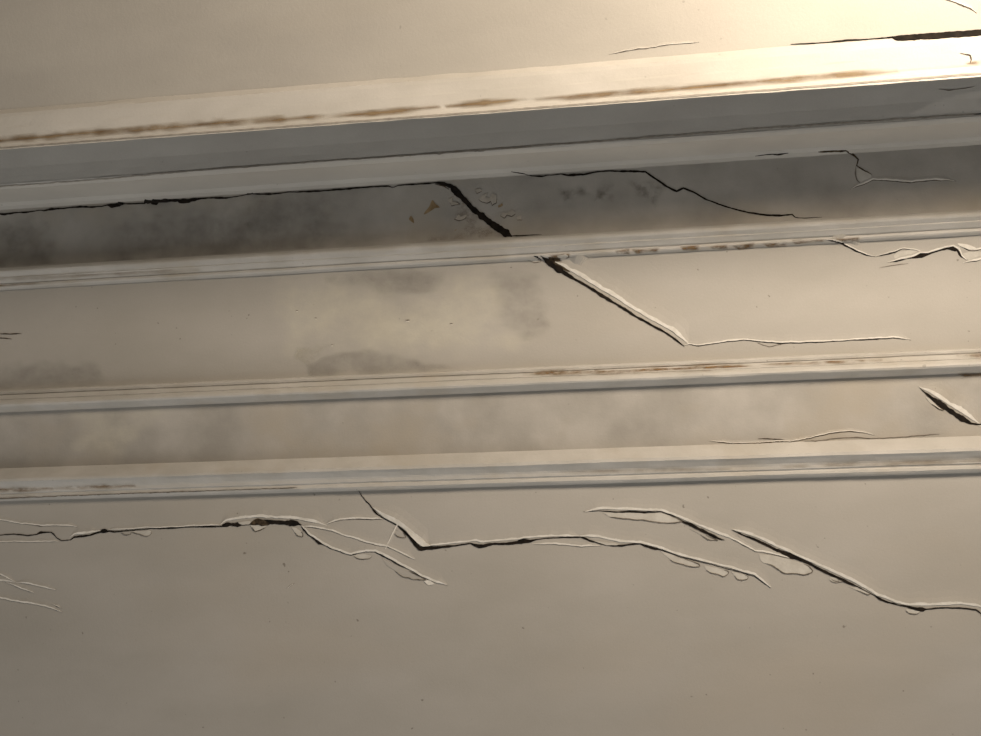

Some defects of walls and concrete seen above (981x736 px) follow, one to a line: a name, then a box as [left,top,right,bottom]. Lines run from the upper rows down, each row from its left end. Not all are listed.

crack [948,0,977,13]
crack [819,150,956,190]
crack [514,170,981,268]
crack [0,182,911,347]
crack [920,381,981,426]
crack [712,427,935,444]
crack [0,487,981,615]